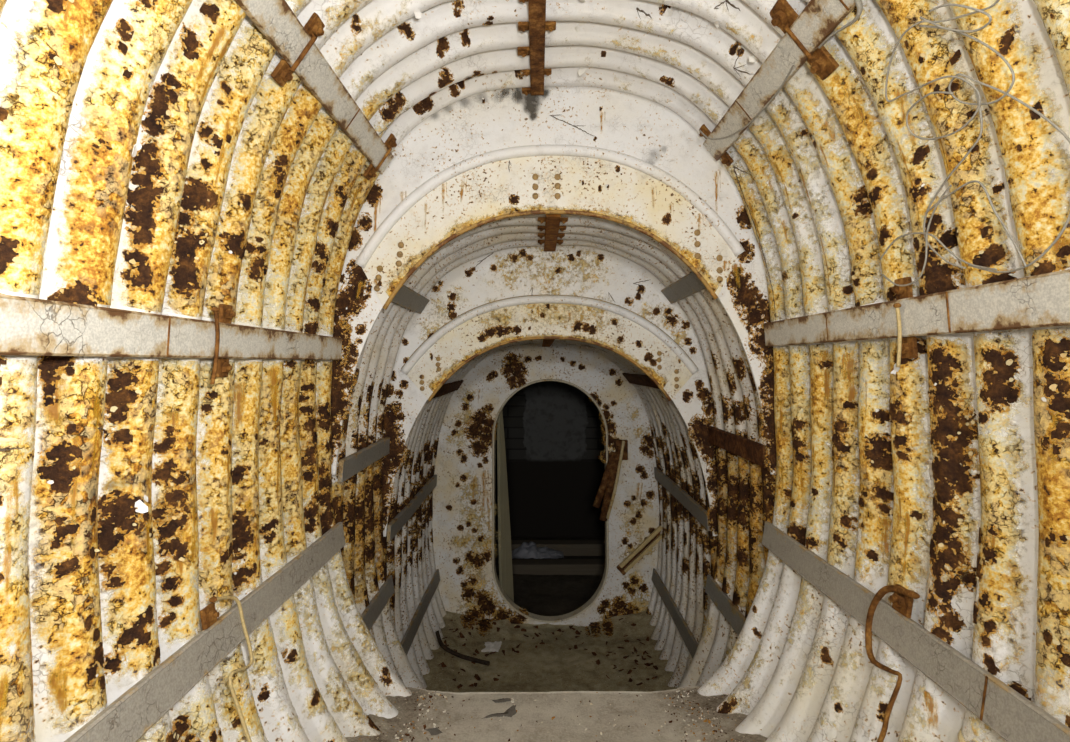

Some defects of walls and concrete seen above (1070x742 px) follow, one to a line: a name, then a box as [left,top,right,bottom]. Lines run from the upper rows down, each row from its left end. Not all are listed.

rust [326,0,401,71]
rust [452,0,465,18]
rust [601,41,699,72]
rust [360,72,408,138]
rust [0,0,381,335]
rust [357,204,719,297]
rust [429,247,667,392]
rust [642,304,686,344]
rust [0,356,402,742]
rust [453,470,515,621]
rust [903,687,938,742]